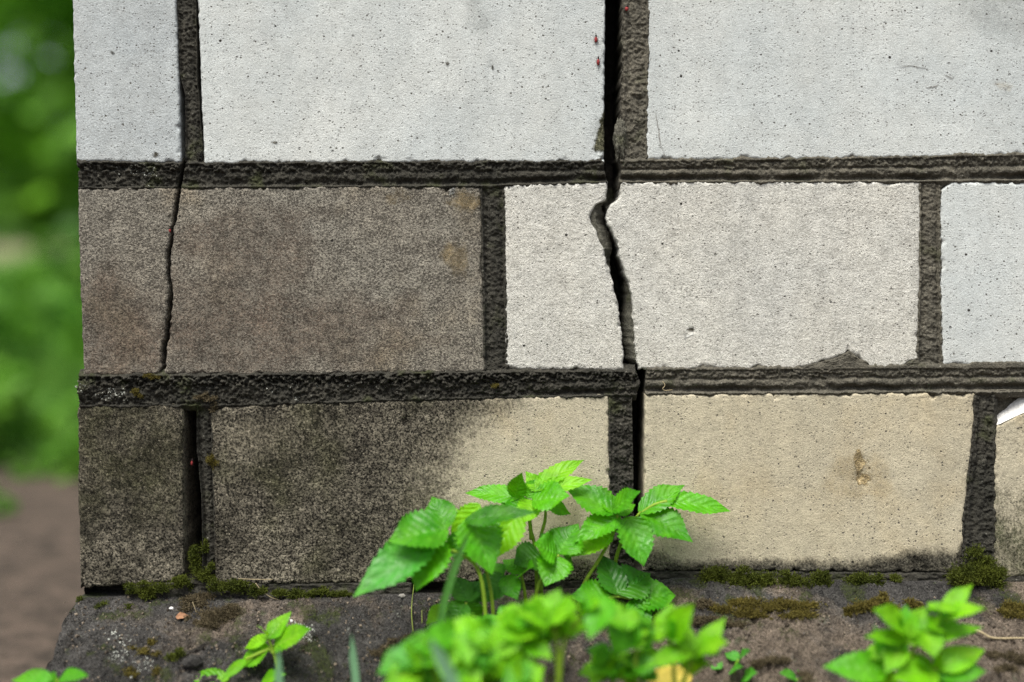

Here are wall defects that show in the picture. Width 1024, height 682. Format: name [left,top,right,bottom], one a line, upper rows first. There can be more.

crack [590,0,640,373]
damp [77,403,185,588]
damp [211,398,523,584]
damp [560,560,599,581]
crack [630,398,638,516]